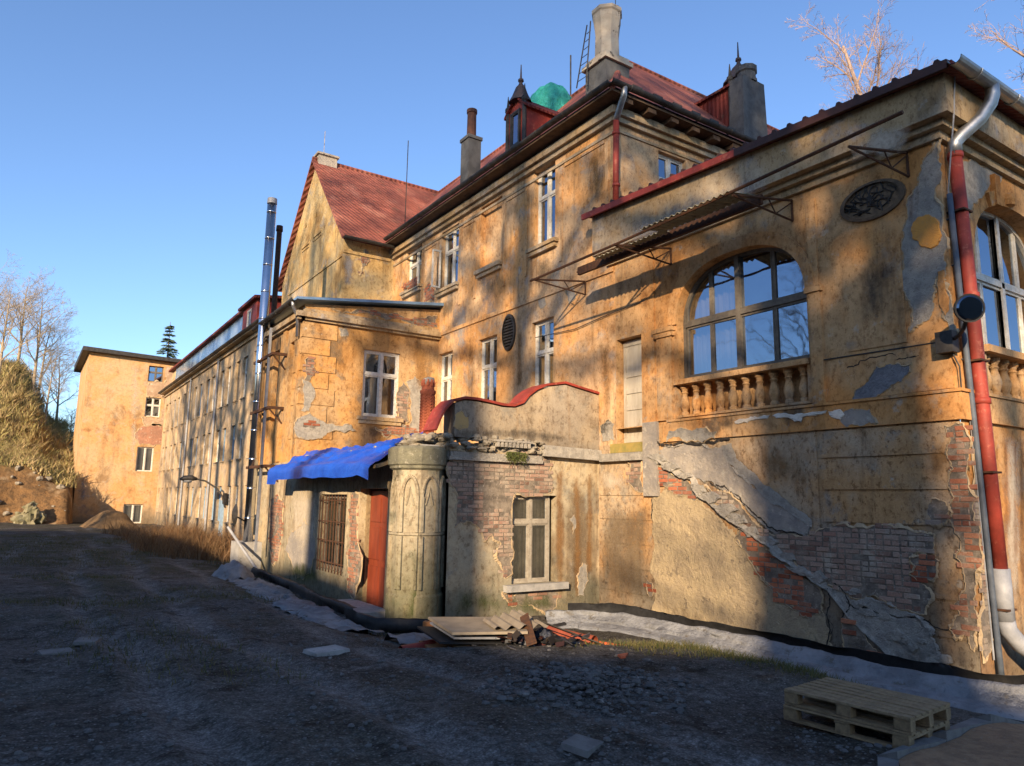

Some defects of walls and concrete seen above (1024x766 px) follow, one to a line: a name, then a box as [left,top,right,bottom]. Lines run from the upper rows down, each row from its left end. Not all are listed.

peeling [901,136,959,334]
peeling [294,356,356,440]
peeling [375,376,422,439]
peeling [734,362,912,427]
flaking render [346,489,363,599]
flaking render [446,447,561,615]
peeling [626,421,994,665]
crack [826,583,955,645]